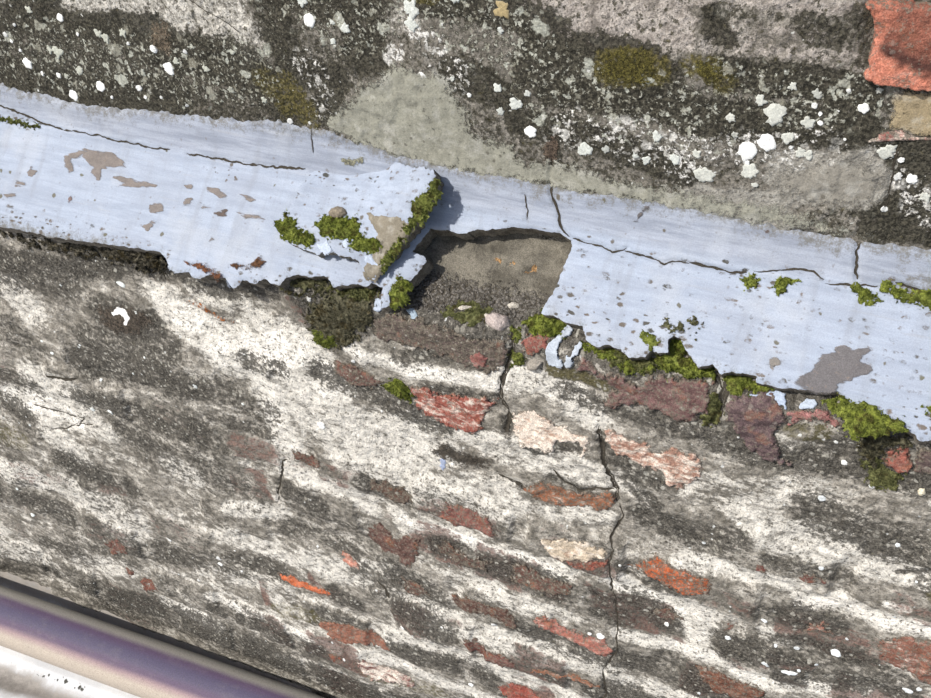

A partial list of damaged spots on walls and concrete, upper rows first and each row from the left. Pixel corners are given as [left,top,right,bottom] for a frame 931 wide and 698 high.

crack [0,105,313,170]
spalling [0,227,162,255]
crack [549,135,920,290]
spalling [168,164,873,469]
crack [499,327,515,432]
crack [499,474,523,488]
crack [553,427,624,698]